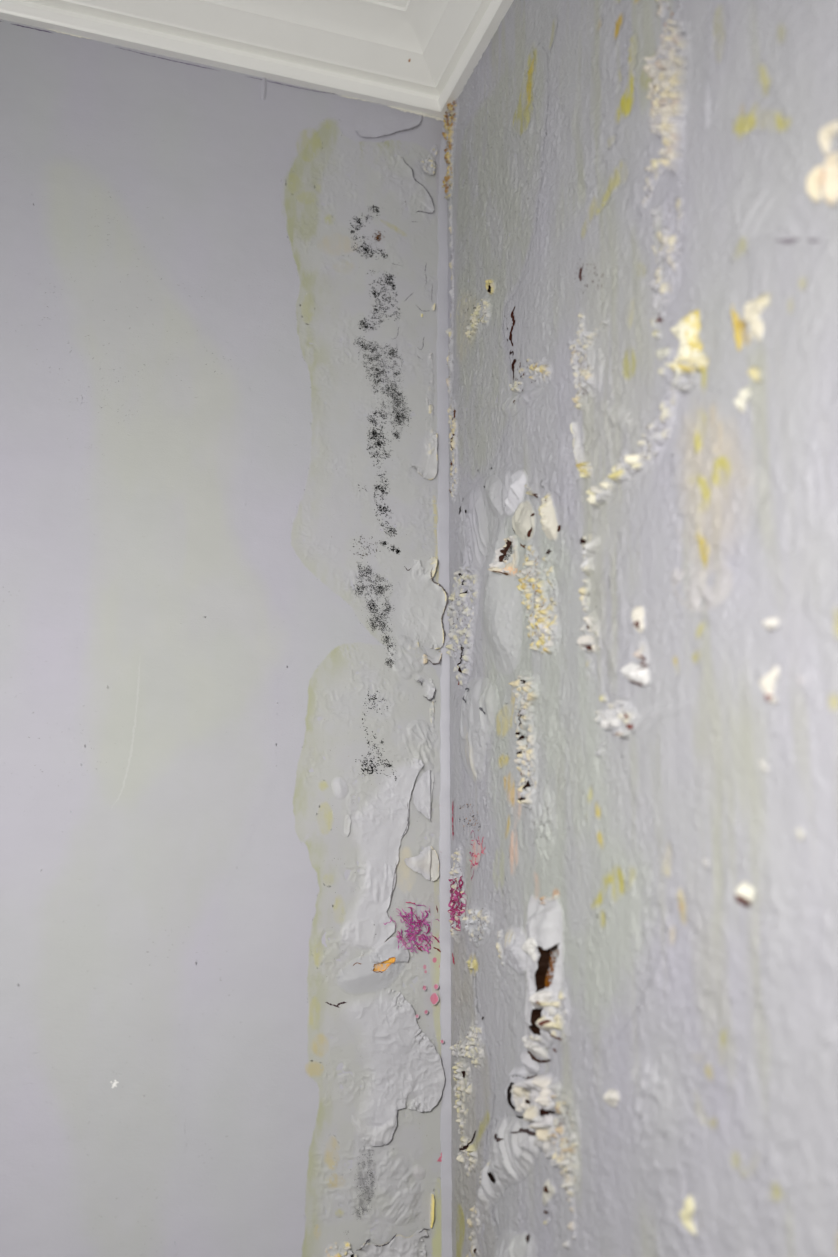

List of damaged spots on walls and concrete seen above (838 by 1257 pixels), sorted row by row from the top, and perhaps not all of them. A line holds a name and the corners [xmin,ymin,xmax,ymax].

leakage [16,150,296,1257]
peeling [388,557,448,741]
leakage [279,0,764,1257]
peeling [338,758,439,955]
peeling [323,1193,434,1257]